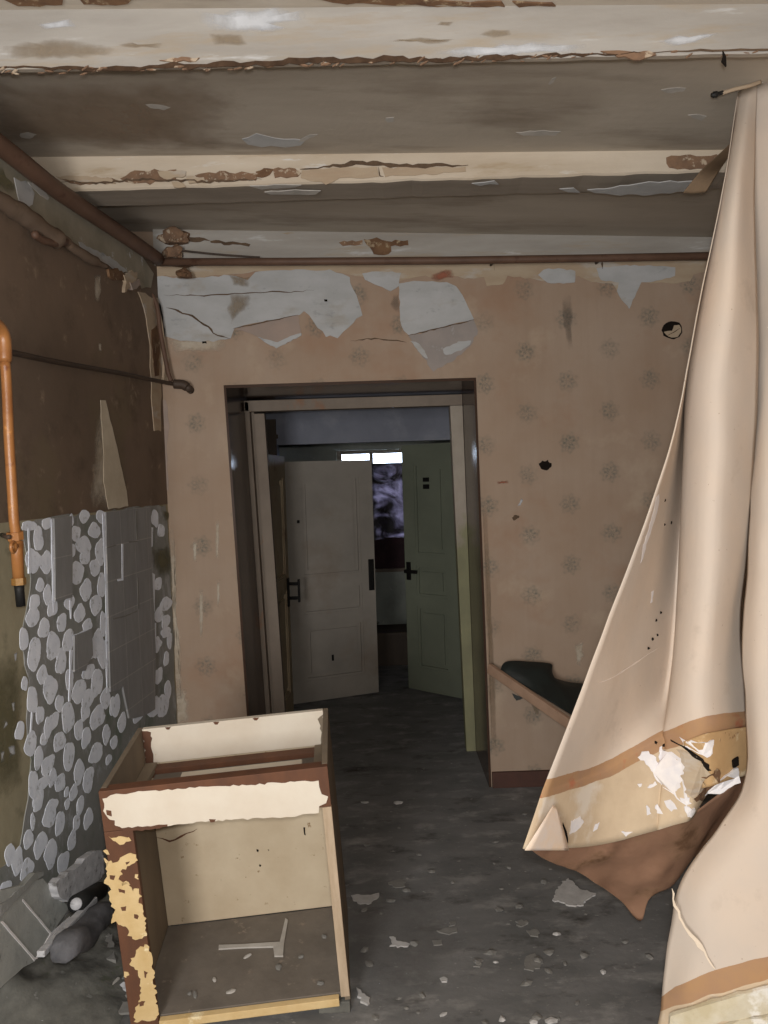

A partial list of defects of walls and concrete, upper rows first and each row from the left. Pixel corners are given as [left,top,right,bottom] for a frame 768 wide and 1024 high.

spalling [0,48,768,75]
peeling [560,154,717,196]
peeling [0,158,706,490]
flaking render [95,400,128,509]